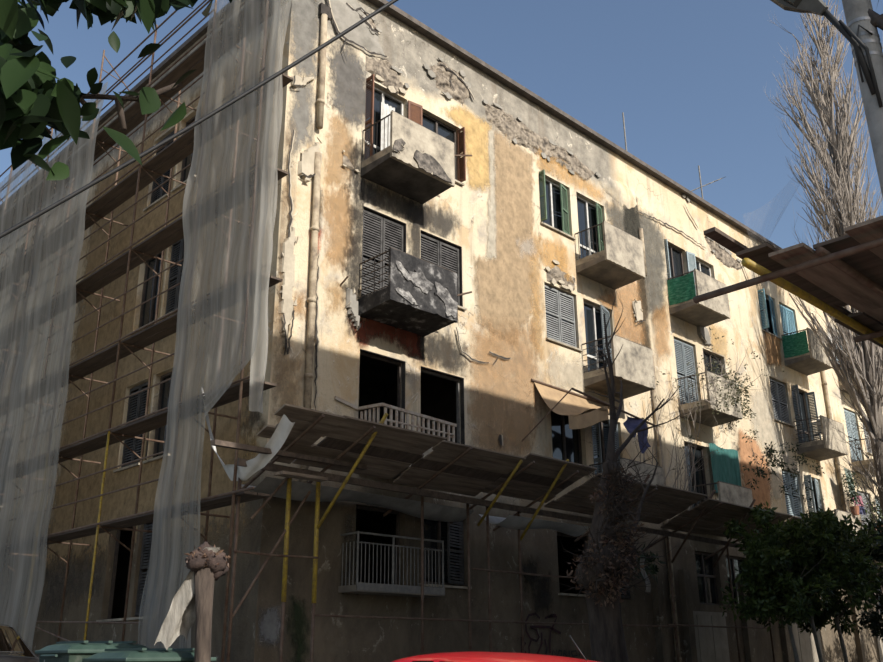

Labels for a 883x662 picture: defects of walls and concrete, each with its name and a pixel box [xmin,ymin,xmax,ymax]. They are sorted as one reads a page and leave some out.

flaking render [365,56,410,95]
flaking render [423,57,471,106]
crack [287,130,295,238]
spalling [391,138,406,154]
spalling [413,150,452,184]
flaking render [483,99,601,258]
flaking render [277,225,299,354]
spalling [395,260,458,318]
flaking render [545,259,575,291]
flaking render [345,288,420,356]
flaking render [739,431,771,509]